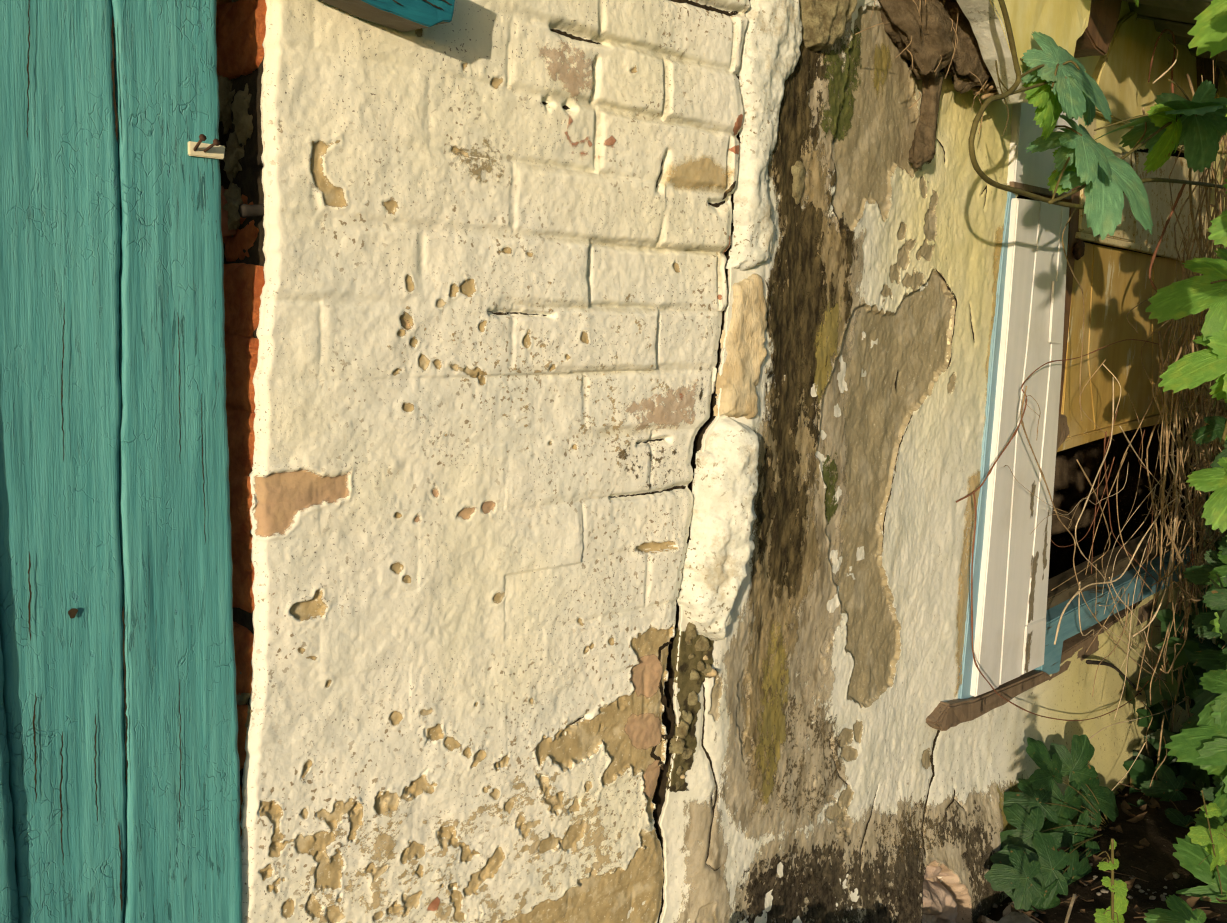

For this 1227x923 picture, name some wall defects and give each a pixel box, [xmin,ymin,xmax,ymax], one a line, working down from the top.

peeling [539,40,595,100]
peeling [565,117,616,154]
crack [722,181,736,200]
flaking render [811,5,957,762]
flaking render [254,469,350,537]
damp [674,22,1023,923]
flaking render [290,589,328,621]
peeling [391,562,411,583]
flaking render [259,622,723,923]
crack [650,642,720,871]
peeling [825,784,854,839]
crack [922,730,964,858]